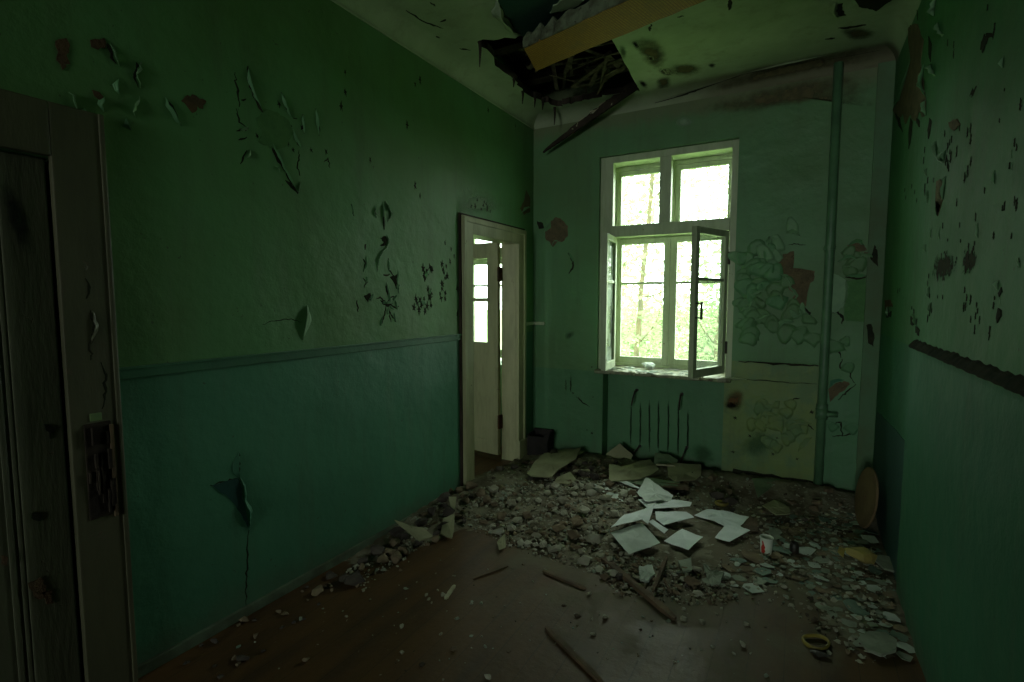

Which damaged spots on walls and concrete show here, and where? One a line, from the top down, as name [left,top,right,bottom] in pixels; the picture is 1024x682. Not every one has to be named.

spalling [491,0,590,36]
damp [621,43,715,88]
spalling [893,0,972,252]
spalling [520,190,568,247]
peeling [356,200,401,326]
spalling [773,249,815,320]
peeling [963,280,1003,340]